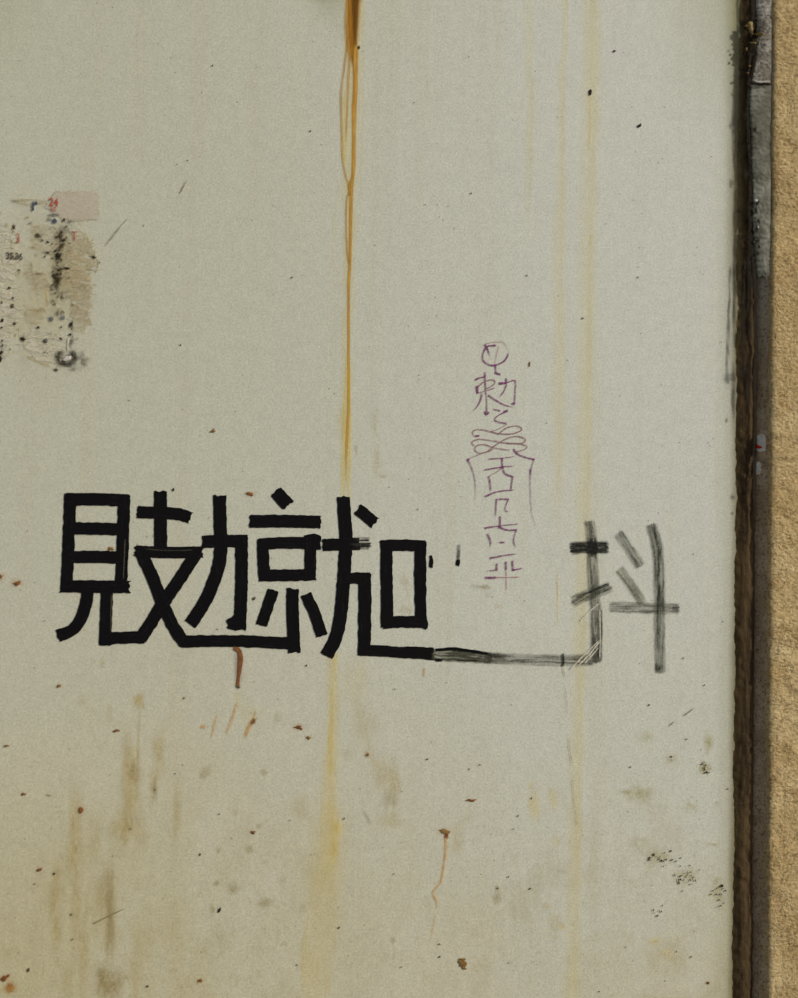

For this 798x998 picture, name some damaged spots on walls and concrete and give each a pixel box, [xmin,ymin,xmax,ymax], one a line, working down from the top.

corrosion [345,0,360,461]
corrosion [233,646,243,688]